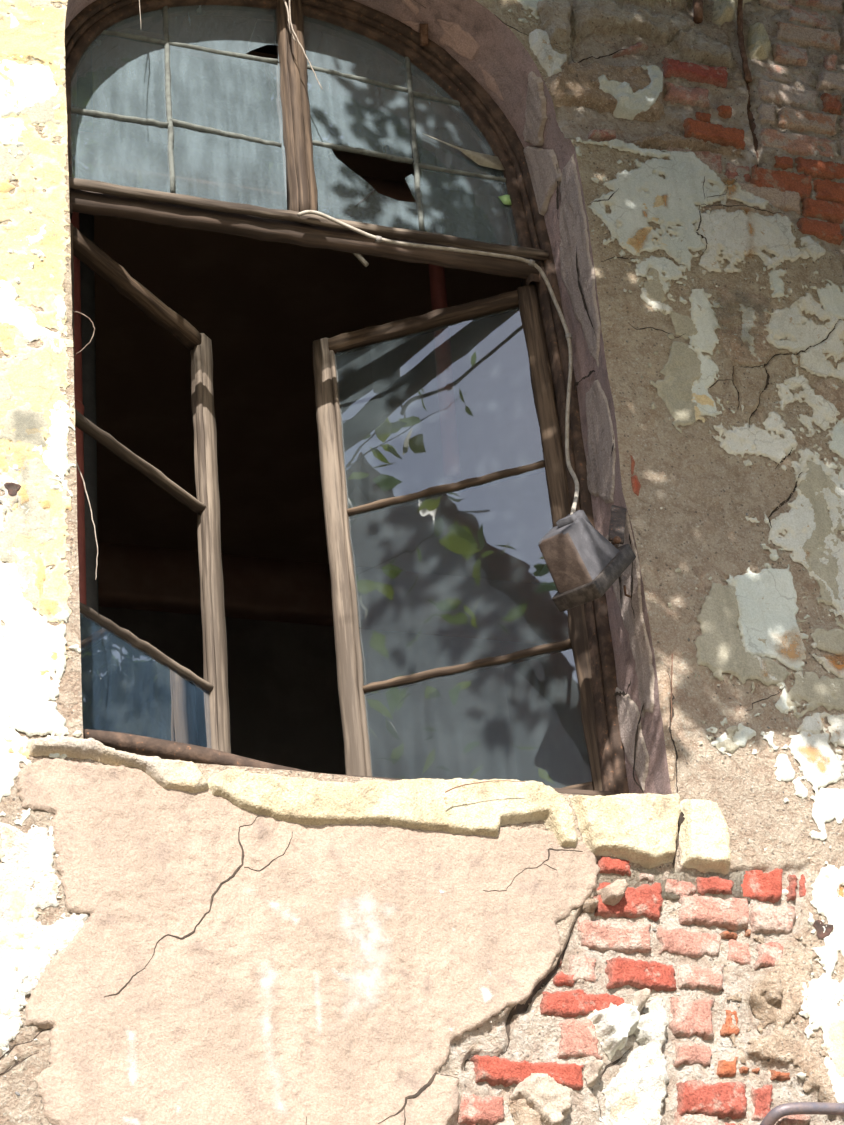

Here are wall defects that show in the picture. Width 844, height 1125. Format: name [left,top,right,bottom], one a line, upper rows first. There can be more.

crack [553,165,561,218]
crack [576,249,633,333]
crack [574,370,595,392]
crack [708,319,841,428]
peeling [0,0,89,1057]
crack [619,534,635,619]
flaking render [457,0,844,1125]
crack [614,674,685,868]
crack [104,816,293,997]
crack [483,848,583,891]
crack [0,1027,53,1075]
crack [378,908,585,1125]